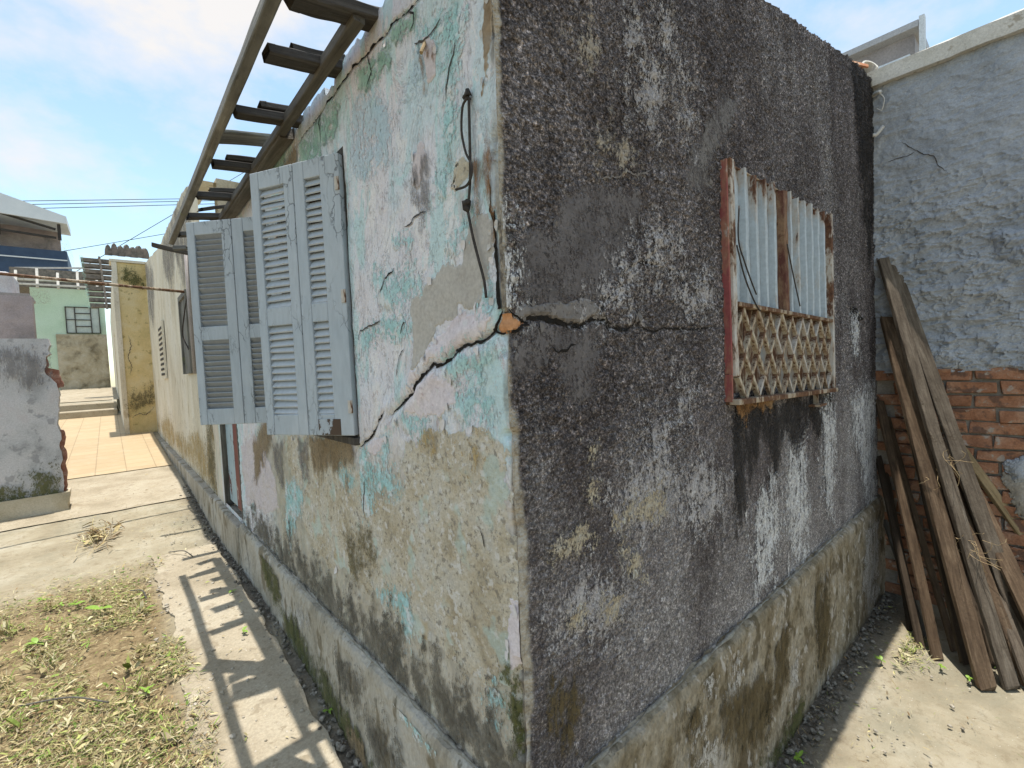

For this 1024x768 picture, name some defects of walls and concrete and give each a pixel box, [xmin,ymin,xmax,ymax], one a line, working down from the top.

peeling [272,96,340,169]
peeling [354,0,492,267]
crack [889,142,948,173]
peeling [354,225,431,381]
crack [358,183,716,447]
leakage [241,499,534,768]
flaking render [241,260,602,746]
leakage [528,355,879,768]